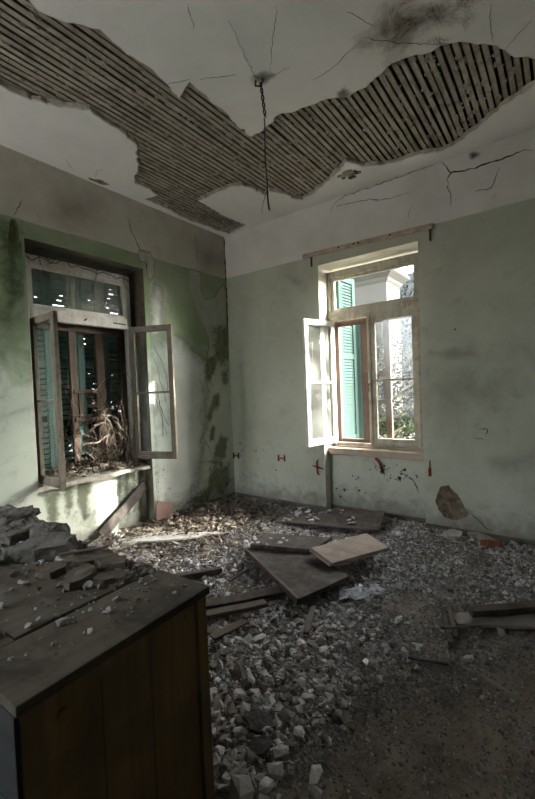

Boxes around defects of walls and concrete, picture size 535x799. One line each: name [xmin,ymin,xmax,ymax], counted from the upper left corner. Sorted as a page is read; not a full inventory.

crack [169,5,290,84]
water stain [380,3,443,45]
flaking render [0,0,535,234]
crack [331,150,532,210]
peeling [189,269,227,359]
water stain [117,325,242,515]
water stain [47,483,90,522]
spalling [436,485,468,520]